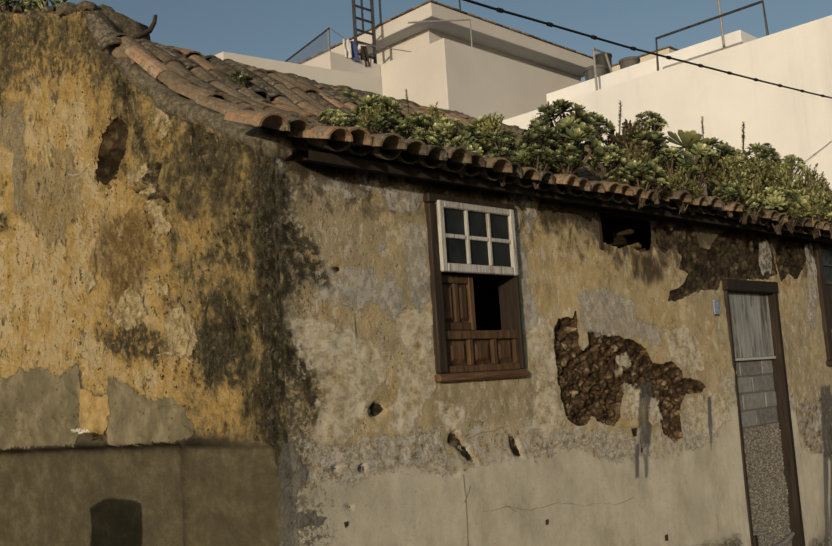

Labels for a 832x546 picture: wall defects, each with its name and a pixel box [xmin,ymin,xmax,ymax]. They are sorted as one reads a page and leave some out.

flaking render [94,113,129,191]
flaking render [650,218,817,327]
peeling [0,364,80,451]
peeling [92,376,194,447]
damp [195,296,248,386]
peeling [277,224,473,546]
flaking render [509,194,731,462]
peeling [796,398,832,454]
crack [459,458,625,546]